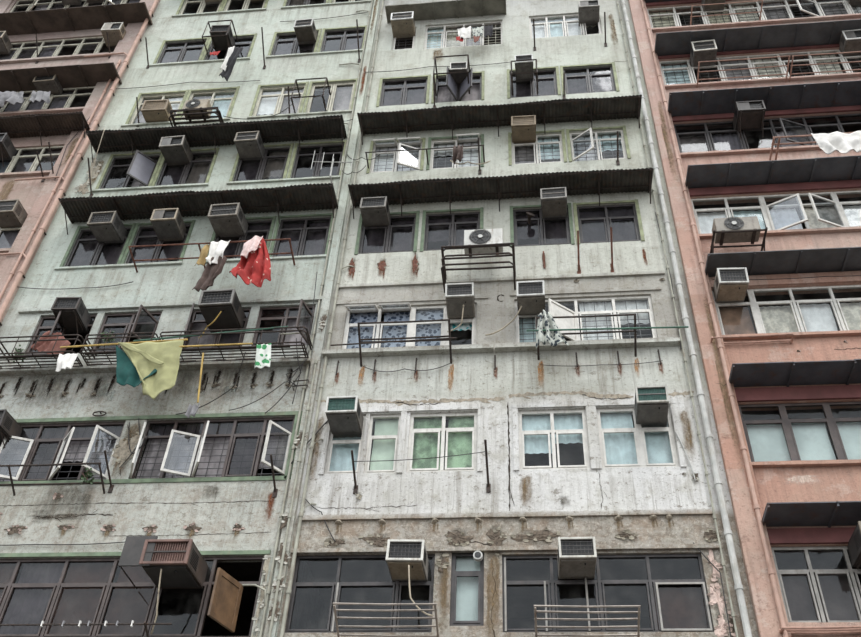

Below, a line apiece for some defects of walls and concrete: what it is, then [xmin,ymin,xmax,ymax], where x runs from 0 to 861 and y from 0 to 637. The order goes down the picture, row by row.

spalling [435,531,474,573]
spalling [486,527,561,556]
peeling [703,528,736,637]